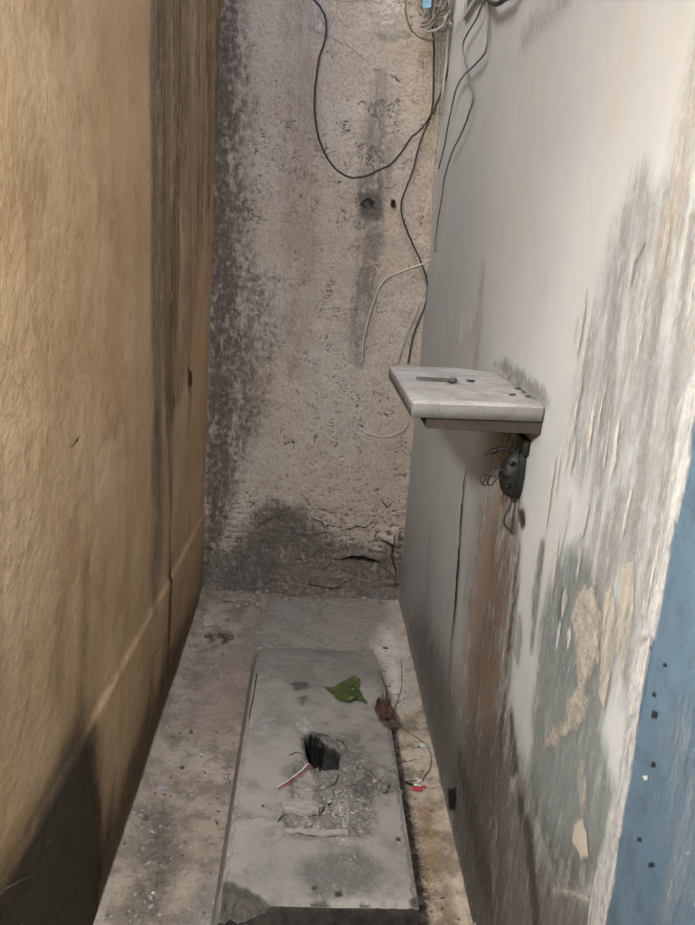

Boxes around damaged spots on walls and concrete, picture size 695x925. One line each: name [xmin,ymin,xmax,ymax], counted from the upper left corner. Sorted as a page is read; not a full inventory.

leakage [150,0,419,710]
peeling [545,295,588,528]
crack [165,505,173,683]
peeling [545,373,695,750]
leakage [0,612,194,925]
spalling [219,881,268,923]
spalling [277,734,400,837]
peeling [553,727,636,925]